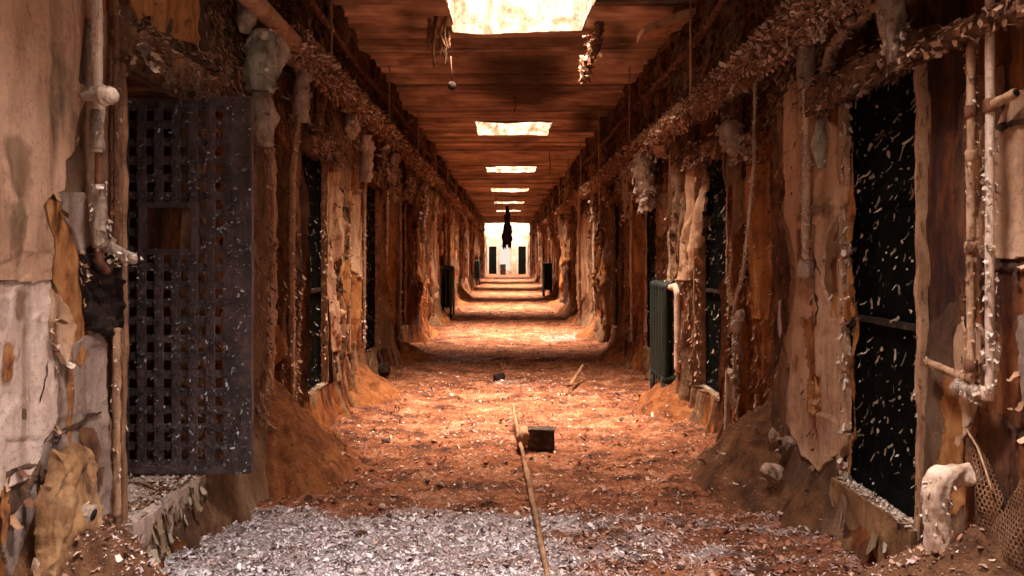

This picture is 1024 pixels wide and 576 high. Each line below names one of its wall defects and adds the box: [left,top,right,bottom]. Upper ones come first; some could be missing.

peeling [0,0,482,576]
peeling [534,0,1024,556]